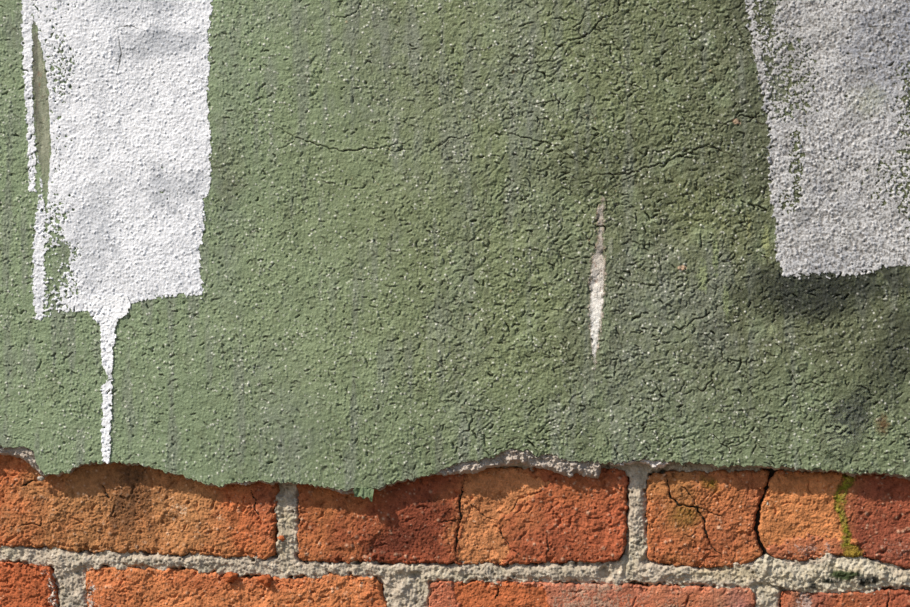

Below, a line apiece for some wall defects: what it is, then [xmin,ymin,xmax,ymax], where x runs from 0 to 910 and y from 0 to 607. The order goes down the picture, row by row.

crack [268,122,411,152]
flaking render [0,446,47,481]
peeling [335,486,374,502]
crack [440,480,545,559]
spalling [436,449,671,564]
crack [666,474,723,554]
crack [754,468,776,556]
spalling [758,423,910,549]
spalling [0,562,57,607]
spalling [451,580,550,607]